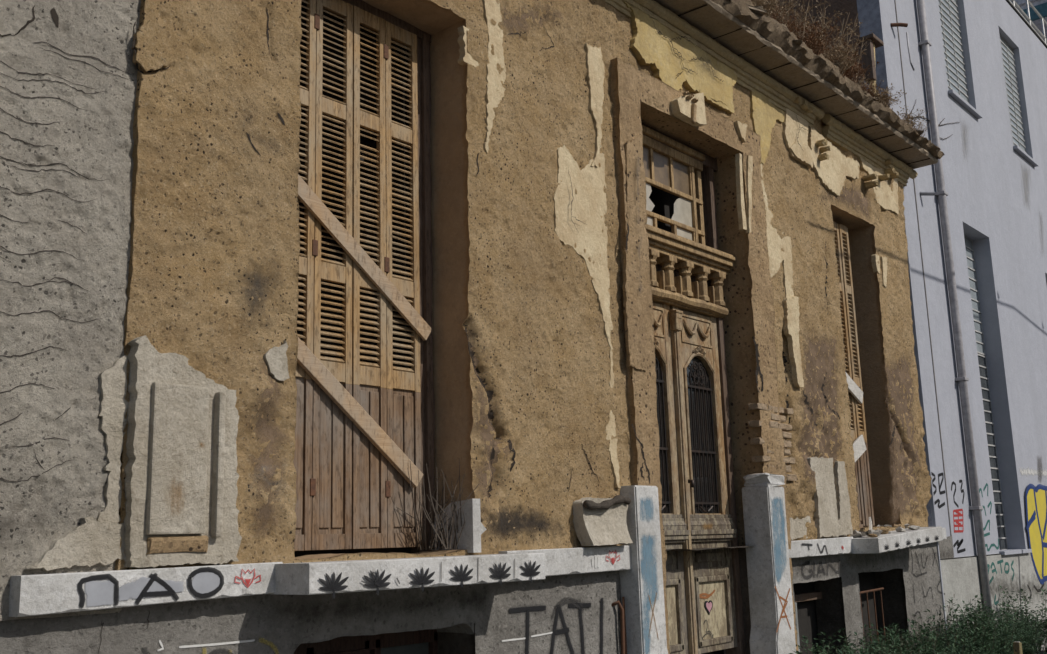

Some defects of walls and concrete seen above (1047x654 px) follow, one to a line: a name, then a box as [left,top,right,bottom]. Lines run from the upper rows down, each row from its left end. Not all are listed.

crack [0,5,35,37]
crack [653,21,723,82]
spalling [822,186,870,217]
crack [465,325,516,498]
spalling [747,337,842,482]